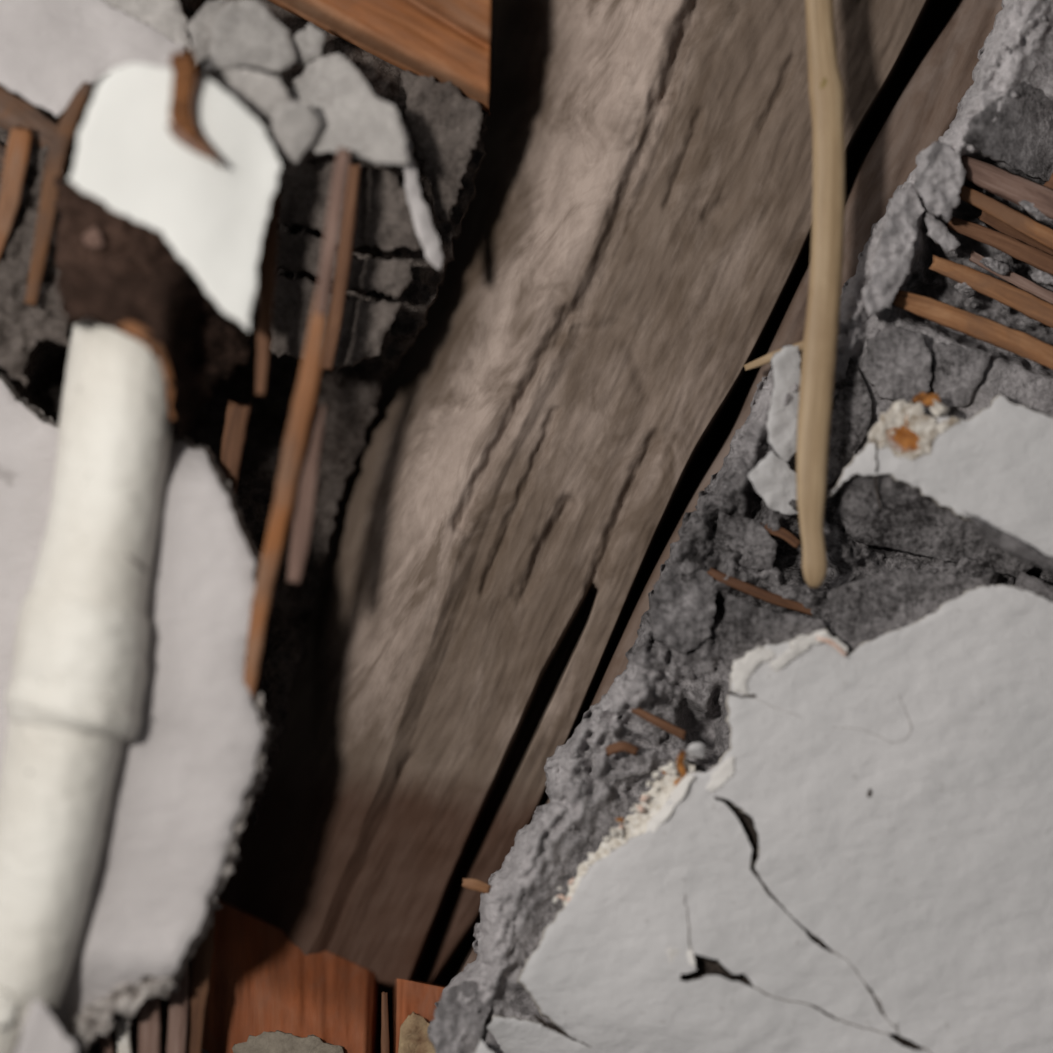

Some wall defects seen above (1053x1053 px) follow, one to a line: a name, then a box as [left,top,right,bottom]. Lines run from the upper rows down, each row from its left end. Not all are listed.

flaking render [179,0,238,46]
flaking render [0,59,337,554]
flaking render [208,0,488,911]
flaking render [427,0,1053,1053]
corrosion [867,392,960,461]
crack [681,796,931,1053]